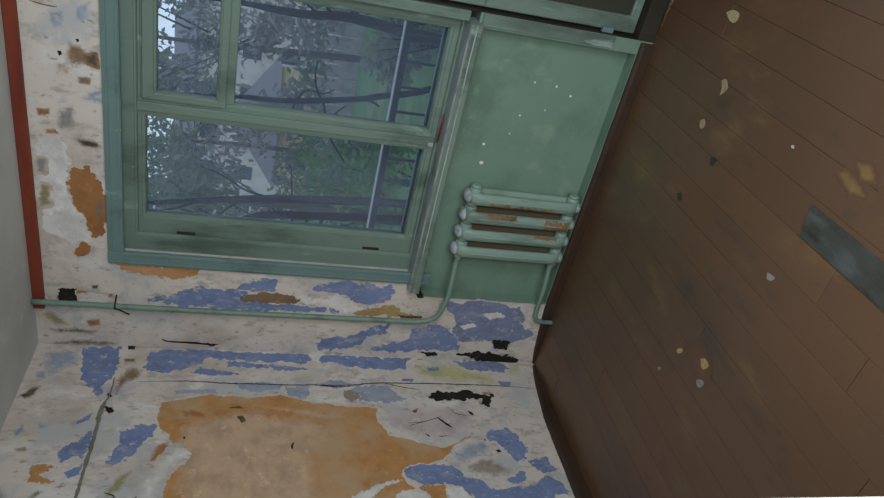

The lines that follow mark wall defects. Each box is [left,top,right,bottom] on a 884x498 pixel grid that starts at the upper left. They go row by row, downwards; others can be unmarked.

peeling [65,164,107,258]
peeling [107,259,202,280]
spalling [57,288,89,301]
spalling [239,292,300,304]
spalling [456,340,518,363]
crack [185,380,533,390]
spalling [428,381,511,407]
crack [410,410,473,437]
crack [74,377,115,498]
peeling [155,379,475,498]
peeling [27,463,83,484]
peeling [507,456,558,485]